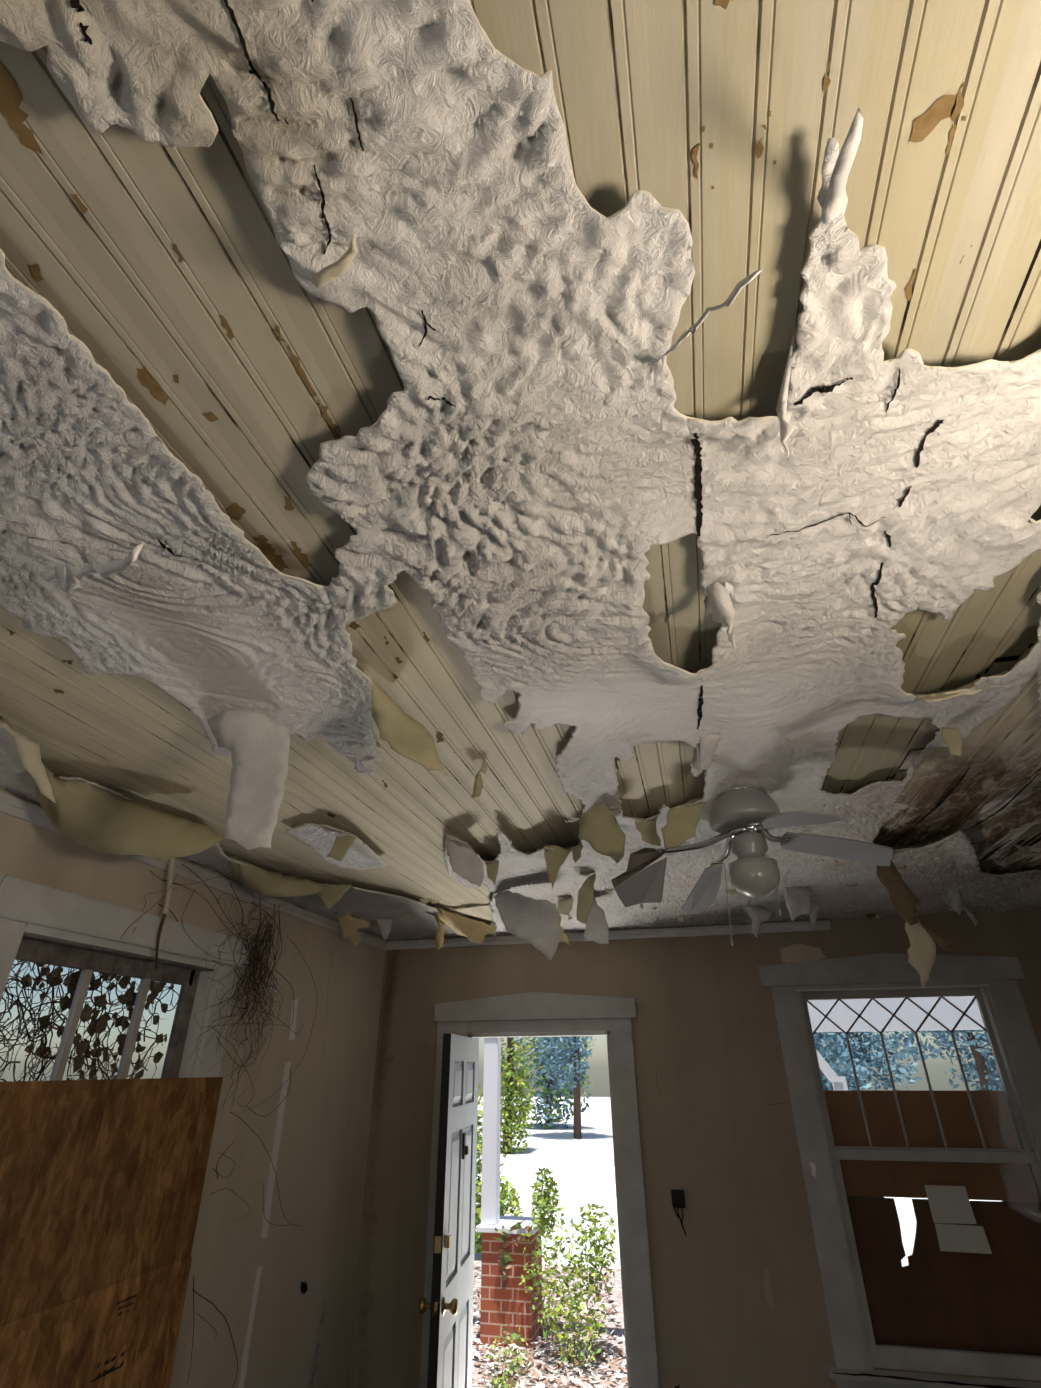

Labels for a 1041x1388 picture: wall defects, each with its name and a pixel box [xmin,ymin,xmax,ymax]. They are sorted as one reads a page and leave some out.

crack [224,0,288,125]
peeling [0,41,404,593]
crack [313,165,332,255]
peeling [470,0,1041,452]
peeling [642,533,736,673]
crack [690,433,703,536]
crack [767,420,944,618]
peeling [0,570,721,960]
peeling [820,549,1041,988]
peeling [727,886,826,963]